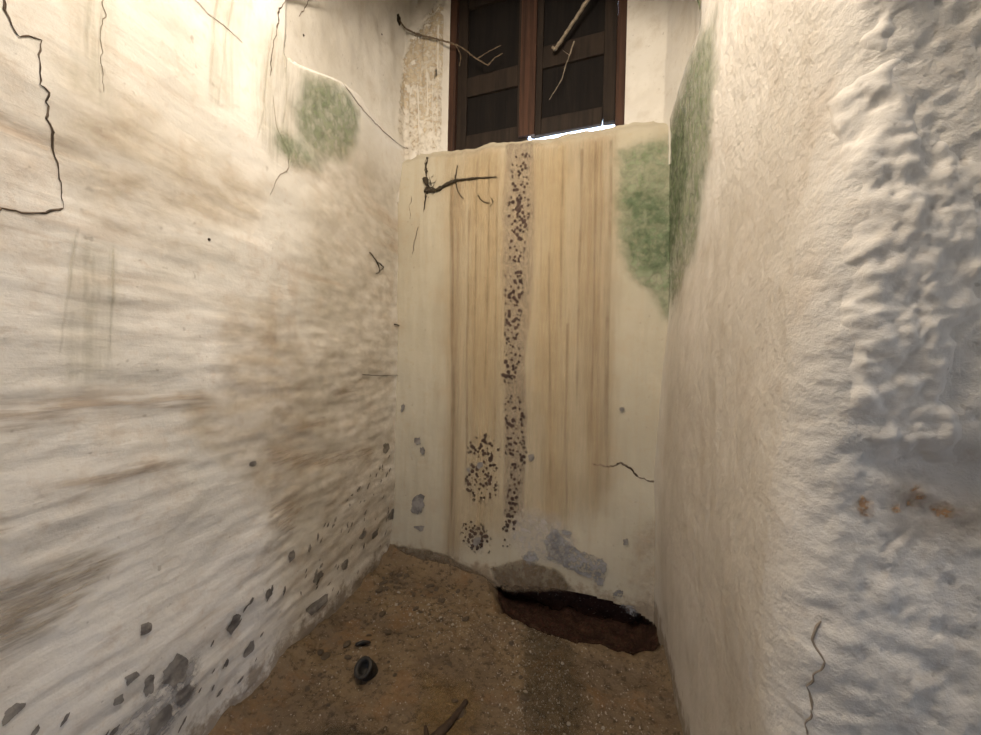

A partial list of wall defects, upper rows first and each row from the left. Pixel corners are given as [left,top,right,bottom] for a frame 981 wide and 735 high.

crack [99,0,107,85]
crack [270,0,309,75]
crack [0,0,64,214]
damp [465,153,530,547]
spalling [308,443,394,552]
damp [462,521,490,553]
spalling [141,622,152,635]
spalling [227,597,254,635]
spalling [243,633,263,661]
spalling [305,558,339,616]
spalling [2,703,26,726]
spalling [106,653,229,735]